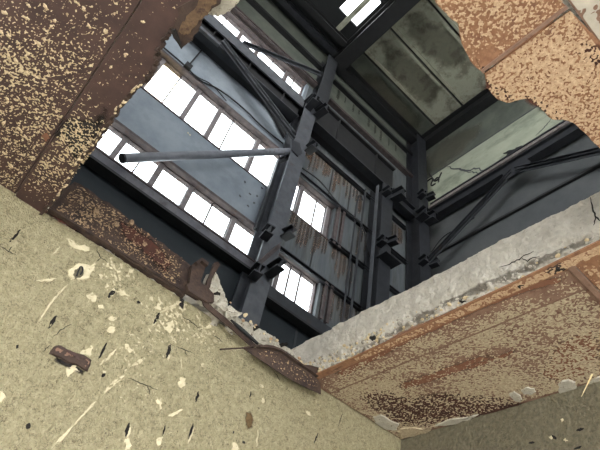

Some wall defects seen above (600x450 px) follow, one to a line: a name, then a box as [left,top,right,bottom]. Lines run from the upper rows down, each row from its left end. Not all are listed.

corrosion [178,0,217,35]
peeling [437,0,600,148]
corrosion [579,42,600,66]
corrosion [485,80,563,120]
peeling [0,0,183,283]
crack [447,166,482,174]
corrosion [119,221,171,272]
spalling [191,191,600,437]
corrosion [335,263,566,377]
spalling [80,343,107,359]
corrosion [540,332,600,381]
corrosion [364,350,521,427]